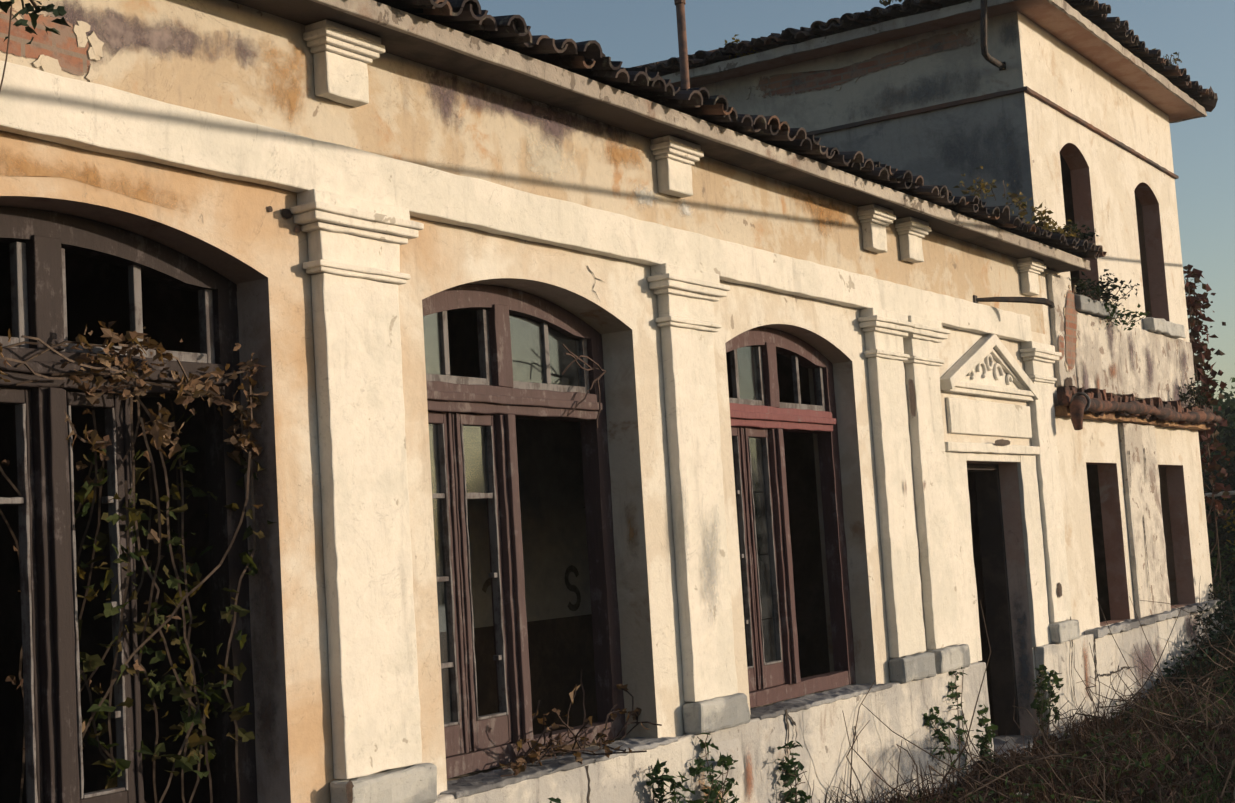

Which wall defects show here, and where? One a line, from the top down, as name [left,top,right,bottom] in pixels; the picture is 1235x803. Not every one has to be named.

peeling [0,8,104,83]
water stain [64,5,195,55]
water stain [228,39,256,62]
flaking render [745,23,979,99]
water stain [1002,25,1017,43]
water stain [431,79,622,140]
water stain [1129,336,1153,385]
water stain [1174,353,1190,407]